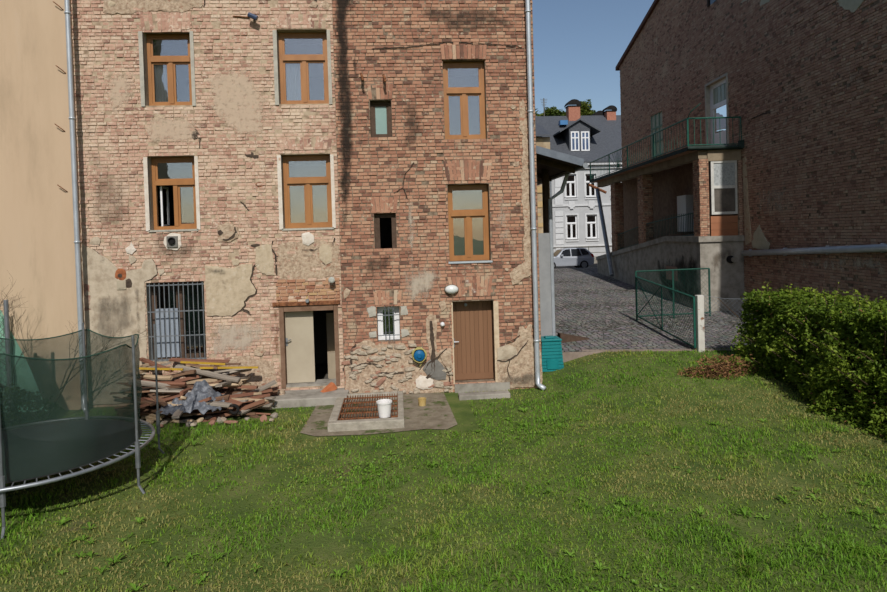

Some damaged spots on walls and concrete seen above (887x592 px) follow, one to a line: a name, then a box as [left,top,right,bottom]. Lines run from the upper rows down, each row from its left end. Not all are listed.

peeling [205,239,351,316]
spalling [327,329,453,432]
peeling [497,323,543,388]